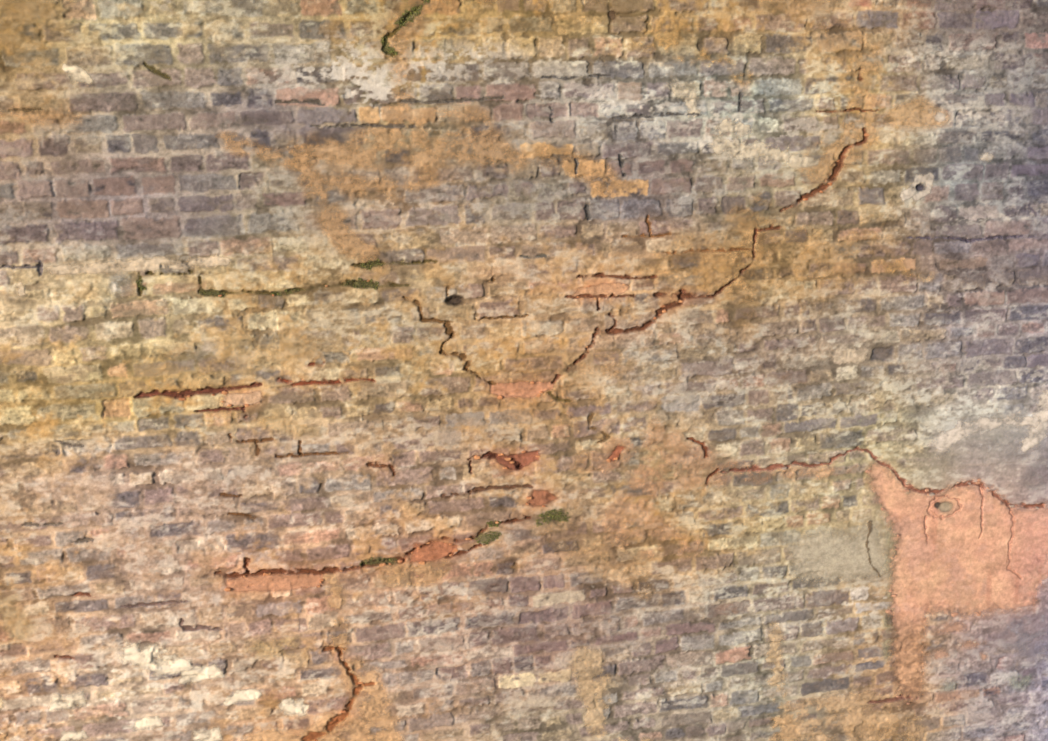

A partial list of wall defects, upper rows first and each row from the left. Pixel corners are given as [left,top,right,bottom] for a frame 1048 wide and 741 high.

crack [382,21,407,56]
crack [138,260,528,385]
crack [547,108,873,444]
crack [134,362,375,458]
crack [220,493,256,519]
crack [215,515,531,578]
crack [366,462,395,476]
crack [441,452,533,499]
spalling [865,463,1048,704]
crack [302,646,375,741]